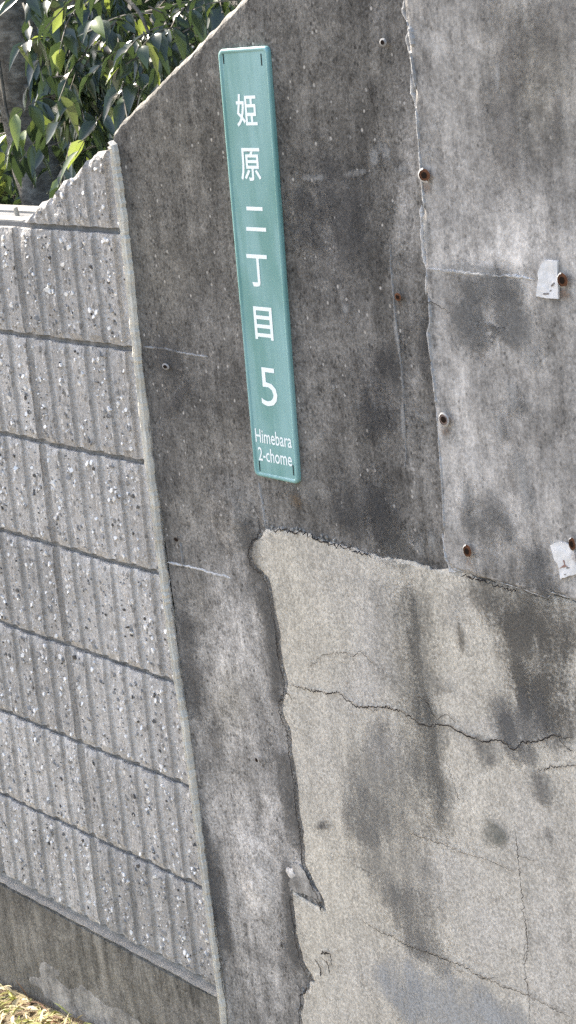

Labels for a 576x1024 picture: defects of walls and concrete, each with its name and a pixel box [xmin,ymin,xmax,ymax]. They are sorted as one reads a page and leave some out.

damp [451,268,528,349]
crack [247,507,576,1024]
flaking render [249,524,576,1024]
damp [469,551,576,763]